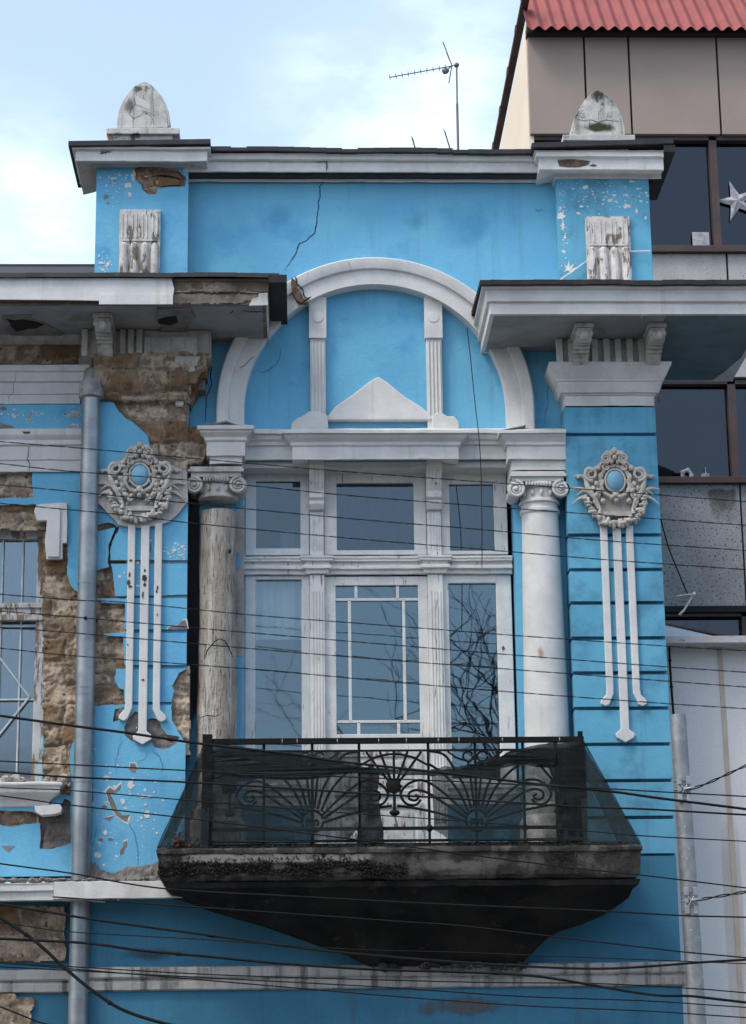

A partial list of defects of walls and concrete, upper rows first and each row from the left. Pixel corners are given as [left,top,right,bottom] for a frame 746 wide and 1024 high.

flaking render [98,167,186,207]
crack [285,161,328,269]
peeling [557,180,649,272]
flaking render [0,314,78,365]
flaking render [93,351,209,472]
crack [108,526,119,565]
flaking render [0,473,78,849]
flaking render [91,553,191,881]
flaking render [0,905,67,963]